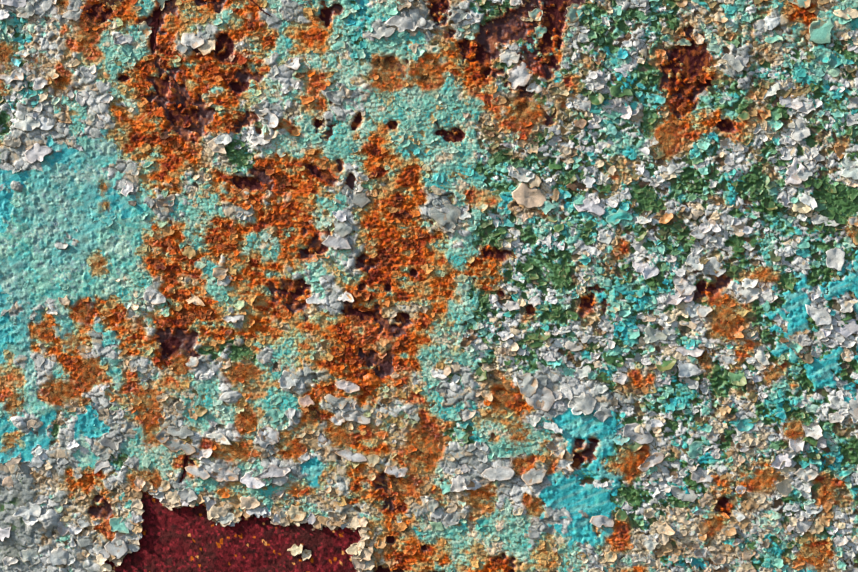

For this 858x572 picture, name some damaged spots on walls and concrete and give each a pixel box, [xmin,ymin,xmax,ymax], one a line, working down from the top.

rust [0,31,23,61]
peeling [170,32,223,55]
peeling [358,0,444,54]
peeling [0,0,115,233]
rust [655,106,721,159]
rust [28,0,470,572]
peeling [404,0,858,572]
rust [711,293,750,354]
peeling [76,330,173,390]
rust [472,380,539,440]
peeling [0,364,422,572]
rust [796,532,833,565]